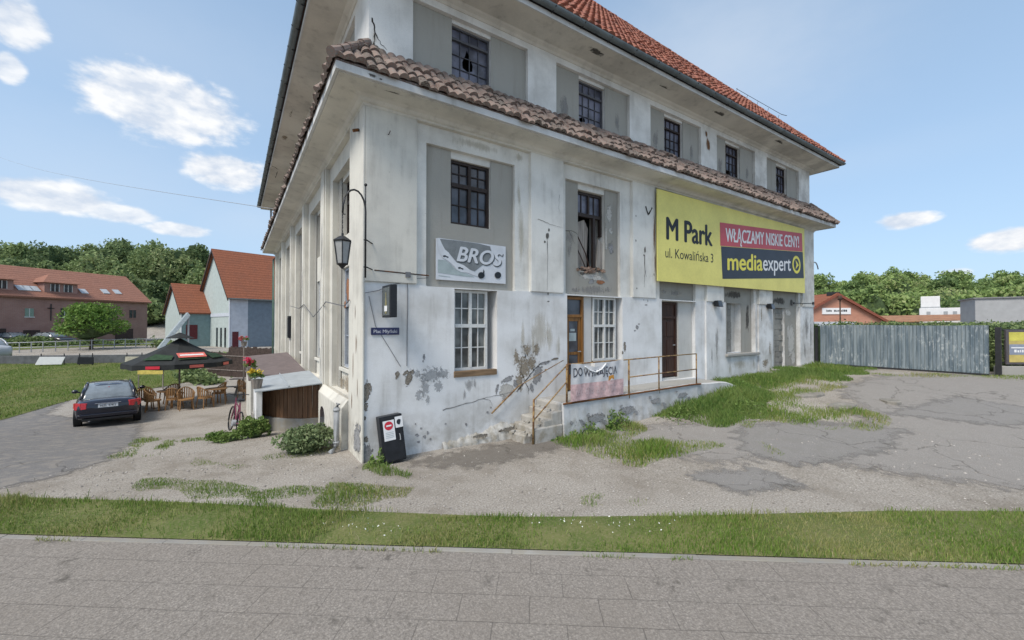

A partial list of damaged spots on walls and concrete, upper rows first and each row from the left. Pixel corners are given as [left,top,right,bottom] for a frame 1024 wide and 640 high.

peeling [395,354,448,402]
crack [443,358,559,411]
peeling [495,358,558,400]
spalling [353,383,373,463]